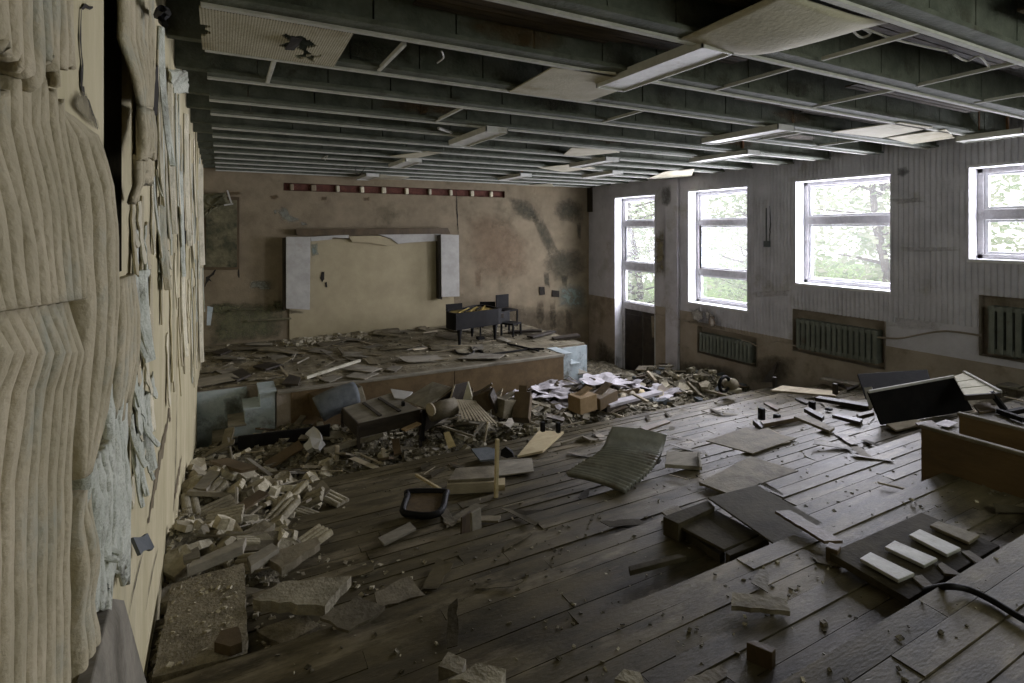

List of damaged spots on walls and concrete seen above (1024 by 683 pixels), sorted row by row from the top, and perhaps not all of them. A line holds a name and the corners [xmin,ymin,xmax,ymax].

peeling [70,0,230,683]
leakage [512,200,580,285]